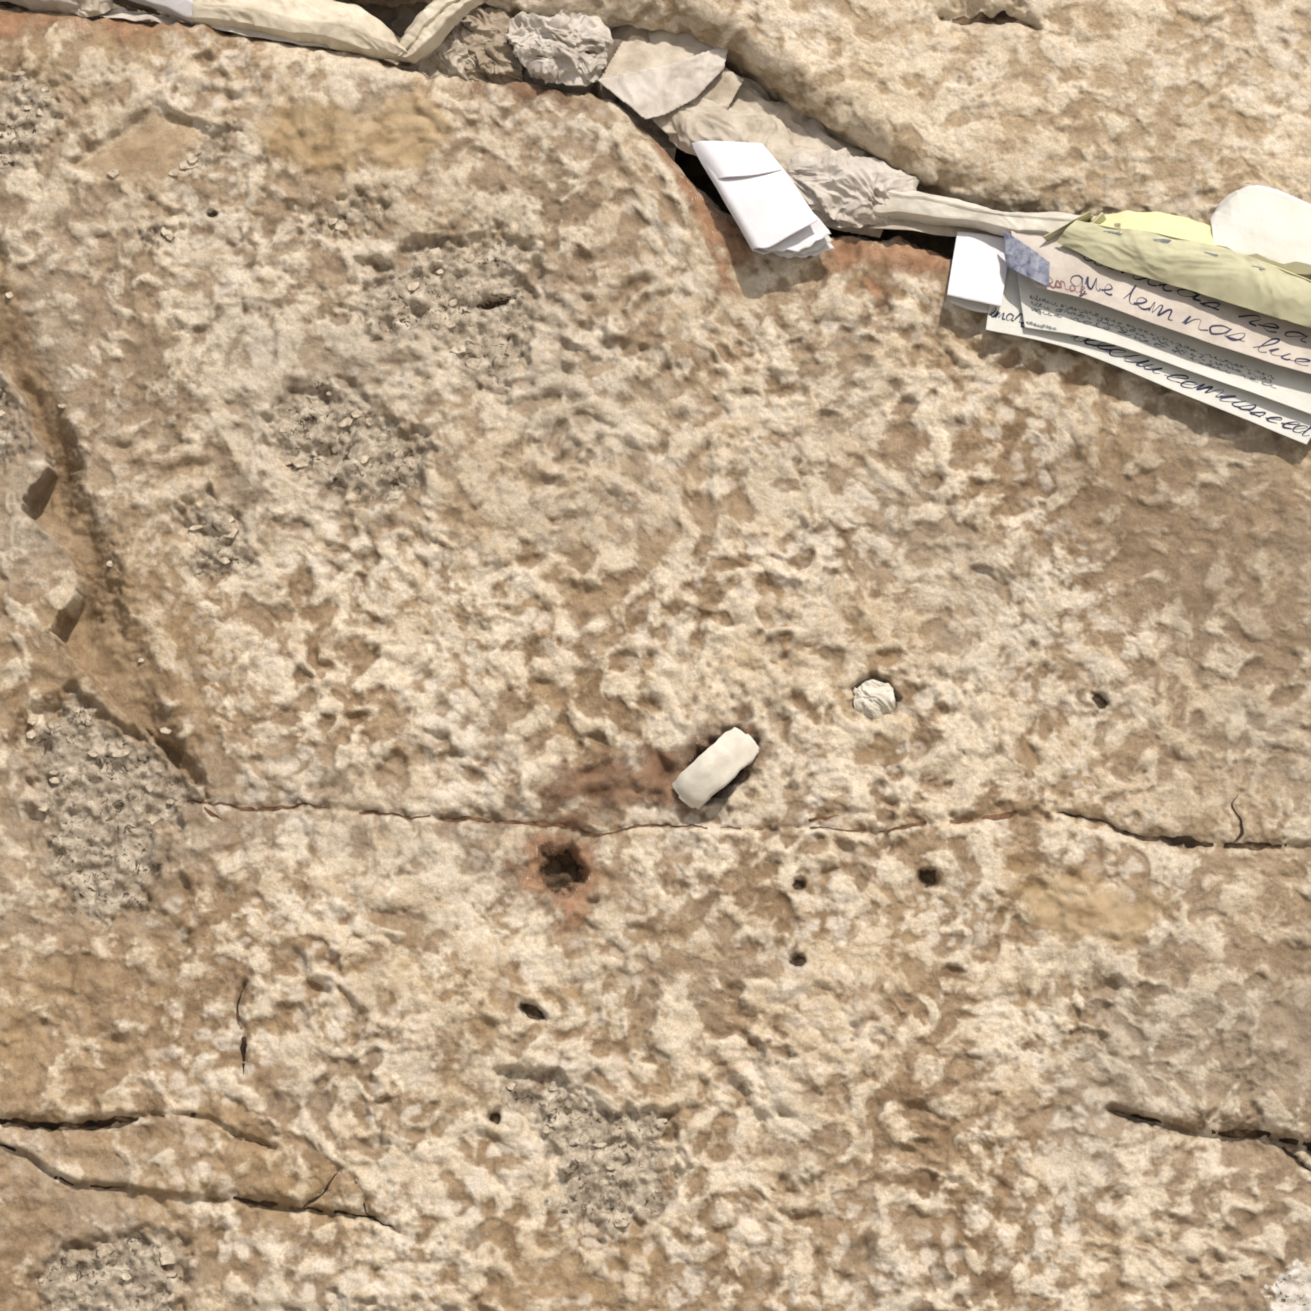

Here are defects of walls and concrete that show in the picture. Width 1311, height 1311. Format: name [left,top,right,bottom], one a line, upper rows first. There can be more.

crack [187,800,326,822]
crack [359,810,761,837]
crack [797,811,1017,833]
crack [1056,794,1287,850]
crack [236,985,247,1075]
crack [0,1113,196,1152]
crack [233,1135,270,1146]
crack [1117,1111,1311,1171]
crack [54,1176,124,1189]
crack [208,1172,395,1230]